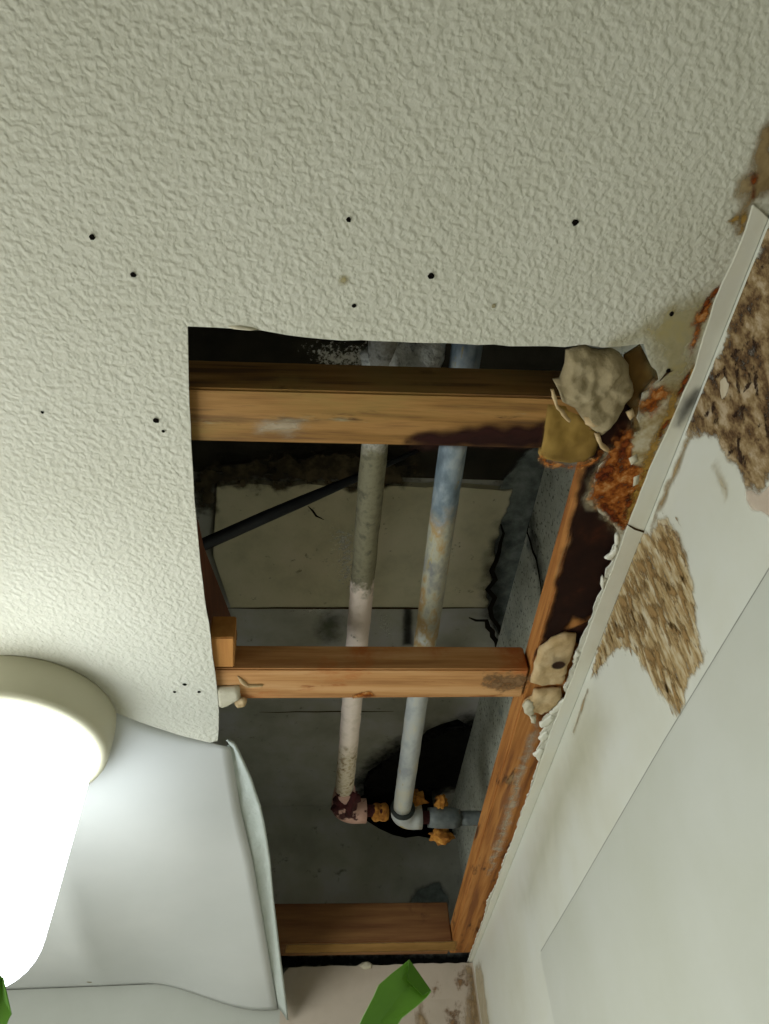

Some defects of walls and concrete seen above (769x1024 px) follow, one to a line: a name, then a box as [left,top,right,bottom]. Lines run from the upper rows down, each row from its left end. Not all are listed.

peeling [550,389,571,423]
corrosion [638,386,670,418]
leakage [406,423,609,470]
corrosion [586,429,644,530]
peeling [604,531,620,560]
crack [469,524,541,647]
peeling [522,697,564,762]
spalling [361,794,434,838]
spalling [422,791,433,810]